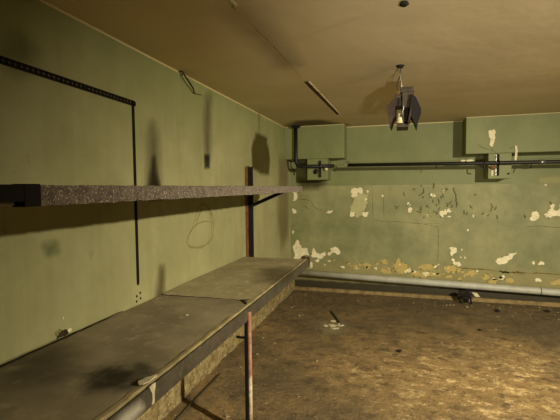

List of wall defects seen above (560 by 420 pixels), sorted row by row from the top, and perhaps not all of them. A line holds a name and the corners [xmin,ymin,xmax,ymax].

peeling [350,186,369,218]
peeling [530,204,560,221]
peeling [293,240,340,268]
peeling [340,246,517,284]